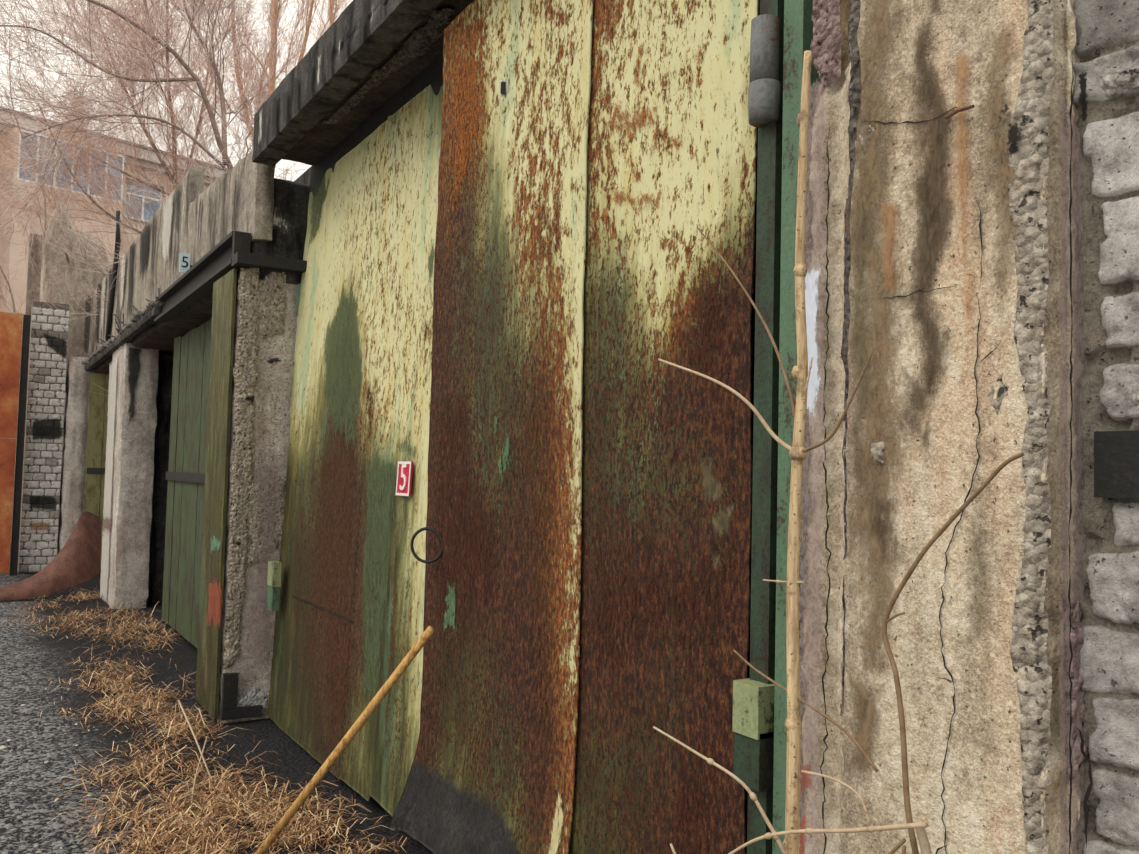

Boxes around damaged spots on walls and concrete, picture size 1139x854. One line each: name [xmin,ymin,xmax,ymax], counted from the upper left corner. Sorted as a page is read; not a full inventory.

corrosion [633,45,644,87]
corrosion [606,102,682,155]
crack [857,107,958,125]
damp [197,180,237,240]
corrosion [607,159,663,216]
damp [84,183,185,354]
damp [847,0,951,671]
corrosion [365,383,375,451]
damp [799,82,827,854]
crack [820,126,832,854]
crack [879,200,1001,854]
damp [850,679,876,770]